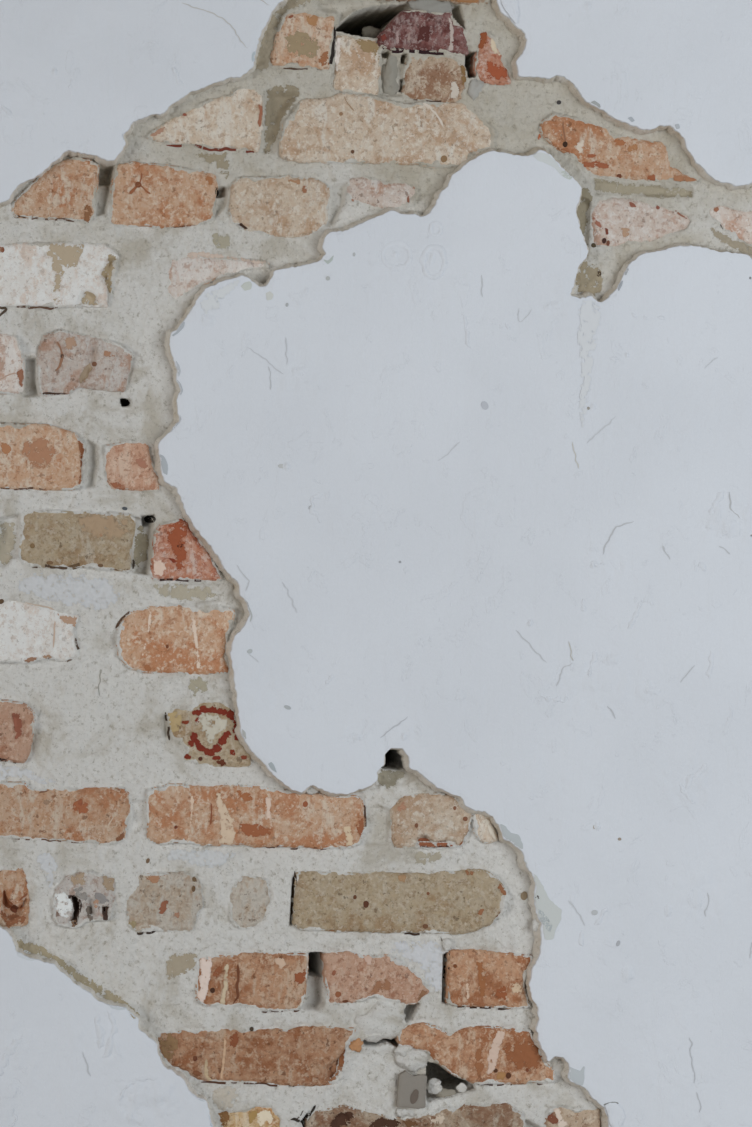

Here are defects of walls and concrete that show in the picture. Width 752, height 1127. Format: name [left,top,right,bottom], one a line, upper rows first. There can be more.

peeling [533,152,572,180]
spalling [101,254,117,293]
spalling [82,291,97,305]
spalling [415,806,469,847]
peeling [500,824,523,849]
spalling [102,874,115,891]
spalling [1,910,26,927]
peeling [521,874,562,940]
spalling [325,1049,345,1081]
peeling [605,1103,625,1127]